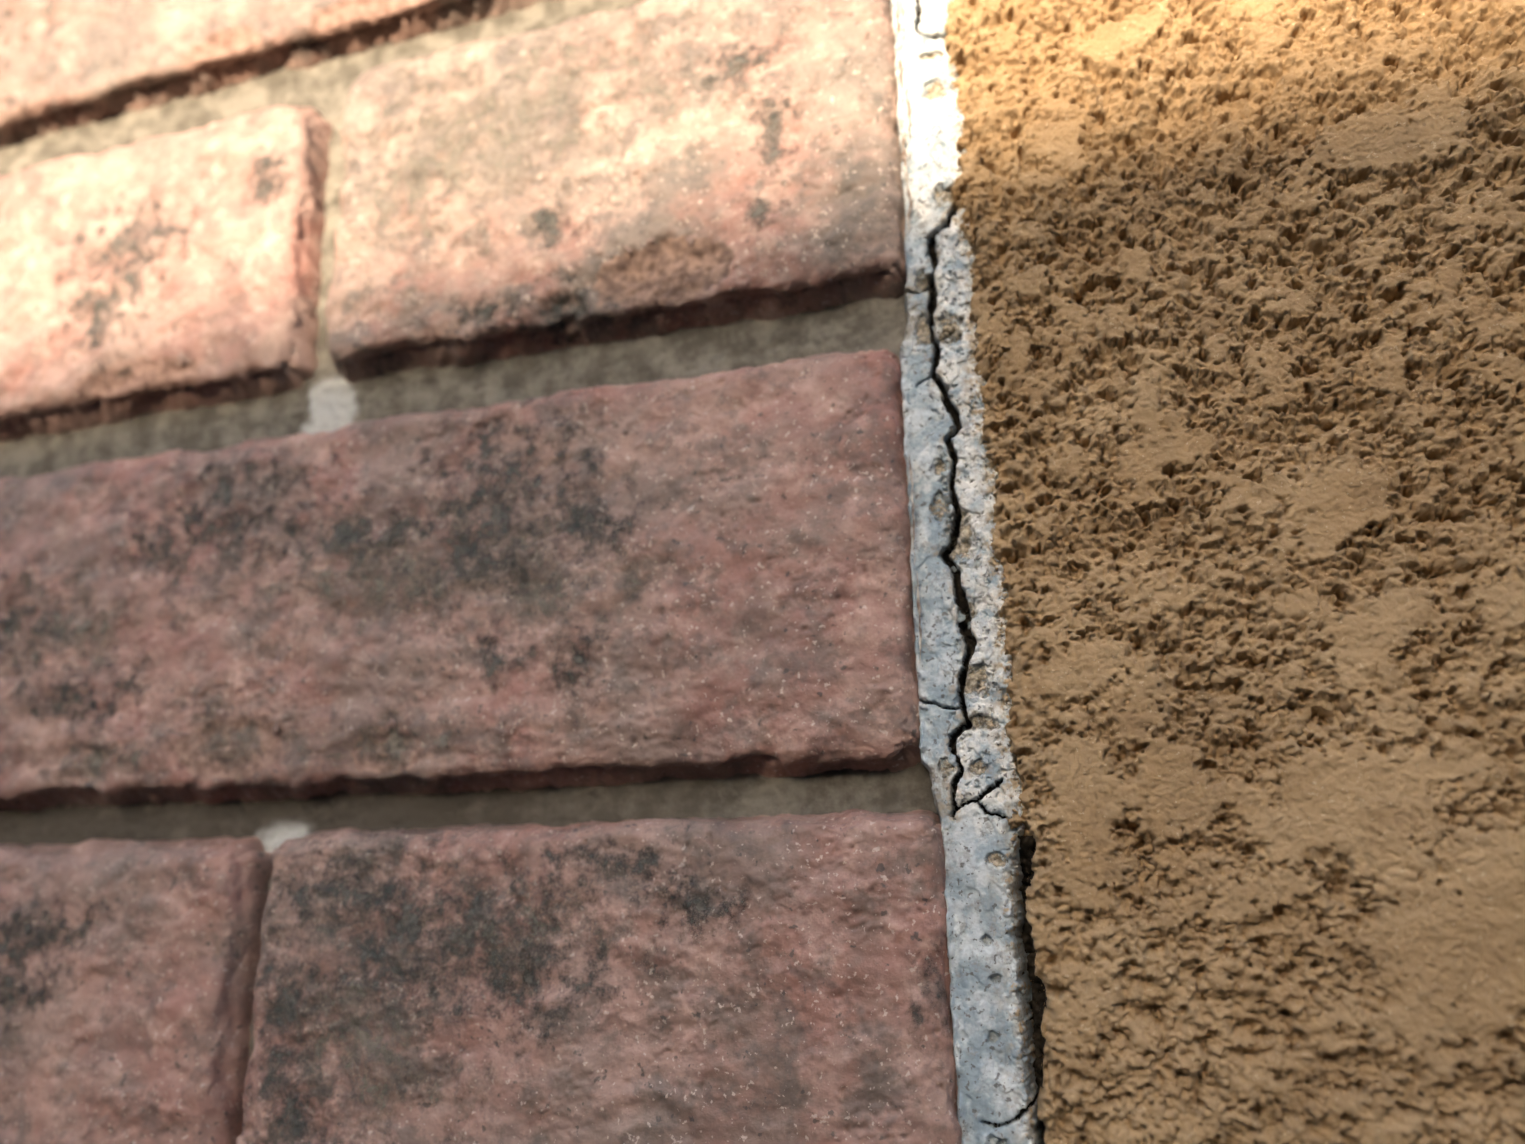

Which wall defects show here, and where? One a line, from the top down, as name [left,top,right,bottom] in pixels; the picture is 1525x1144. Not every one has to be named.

crack [905,209,1047,1144]